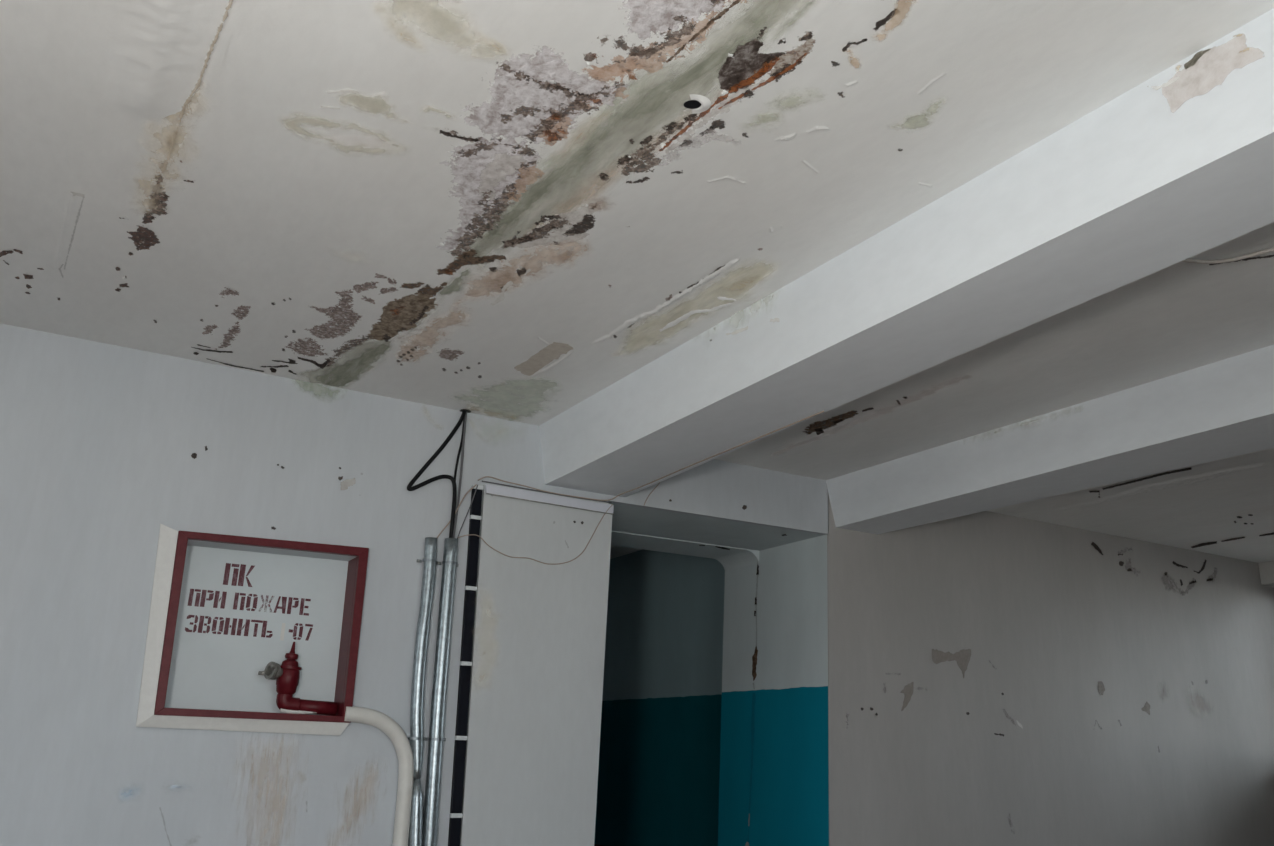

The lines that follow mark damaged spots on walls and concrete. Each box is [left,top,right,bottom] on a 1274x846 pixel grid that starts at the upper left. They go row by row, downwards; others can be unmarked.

crack [141,0,233,206]
leakage [395,0,490,55]
leakage [425,109,479,142]
leakage [440,0,803,294]
corrosion [659,53,807,154]
spalling [718,27,815,98]
flaking render [1151,34,1264,112]
flaking render [191,0,741,378]
peeling [0,249,44,294]
leakage [628,266,768,351]
leakage [305,341,389,386]
flaking render [802,408,874,435]